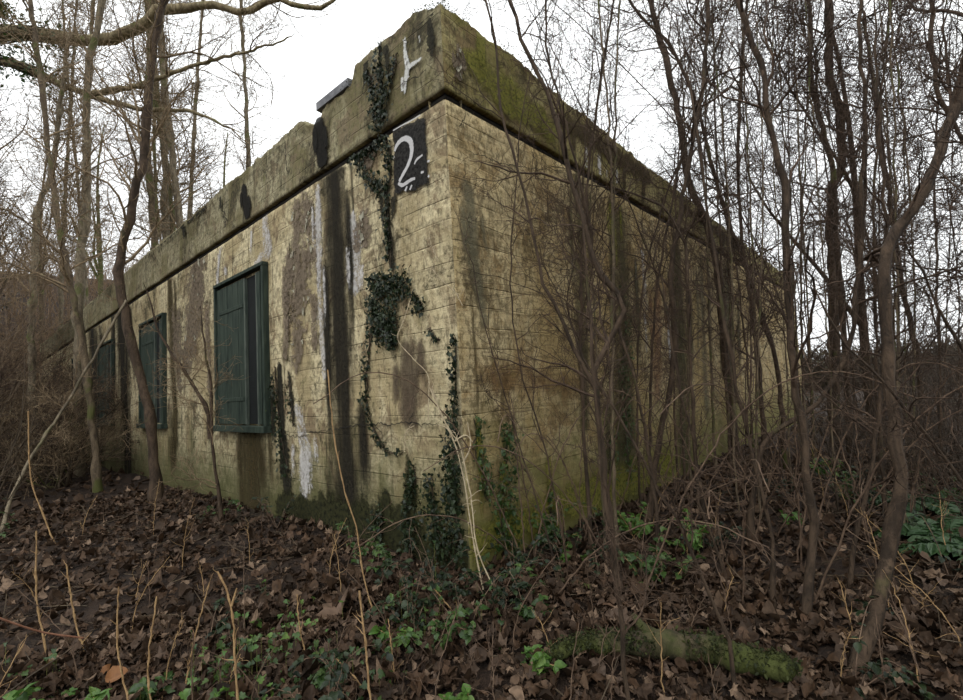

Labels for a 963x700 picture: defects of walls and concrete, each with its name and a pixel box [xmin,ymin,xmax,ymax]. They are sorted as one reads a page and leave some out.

water stain [240,184,251,220]
water stain [250,217,272,264]
water stain [311,116,369,506]
water stain [237,361,318,511]